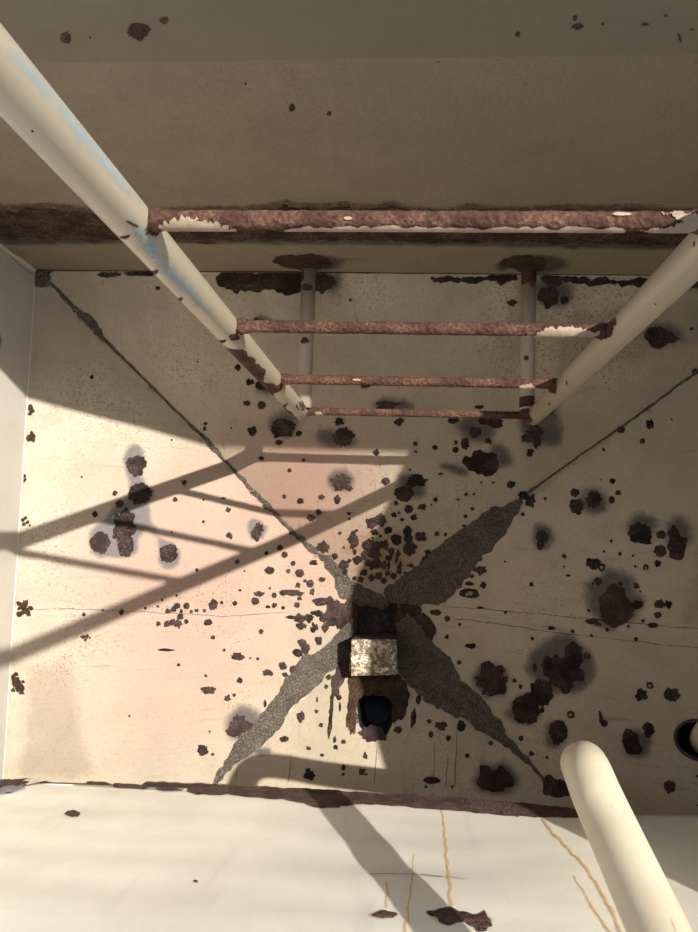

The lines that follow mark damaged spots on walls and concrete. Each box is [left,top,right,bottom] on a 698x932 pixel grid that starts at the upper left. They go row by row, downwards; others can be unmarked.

rust [0,203,120,241]
rust [216,253,341,296]
rust [167,230,689,246]
rust [438,405,510,484]
rust [144,589,241,639]
peeling [213,499,546,787]
rust [474,626,593,725]
crack [447,606,698,648]
rust [585,539,672,637]
rust [297,650,421,782]
rust [113,719,621,932]
crack [372,872,465,880]